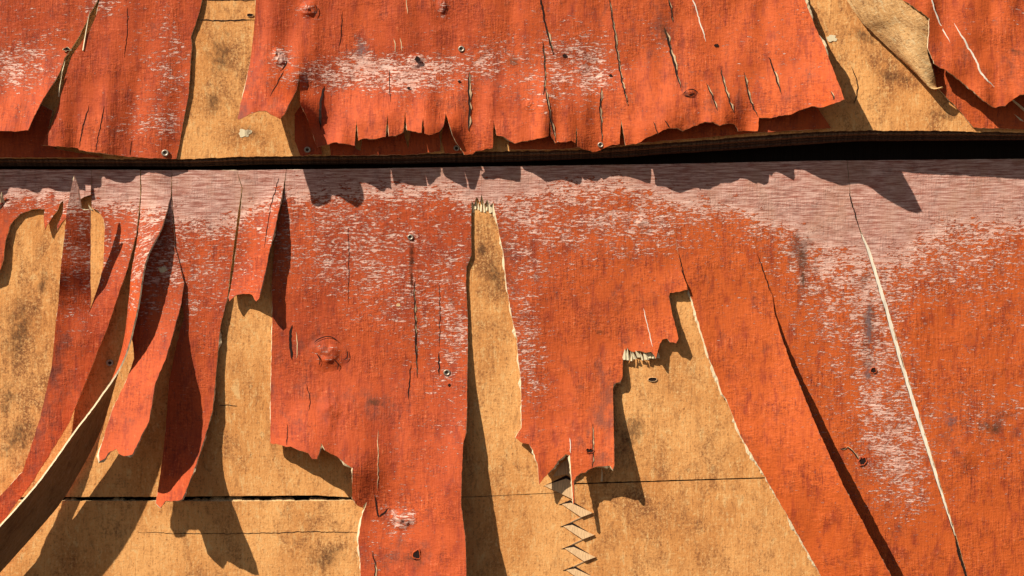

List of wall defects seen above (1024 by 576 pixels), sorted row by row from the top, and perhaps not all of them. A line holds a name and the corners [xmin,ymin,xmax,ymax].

crack [849,193,967,576]